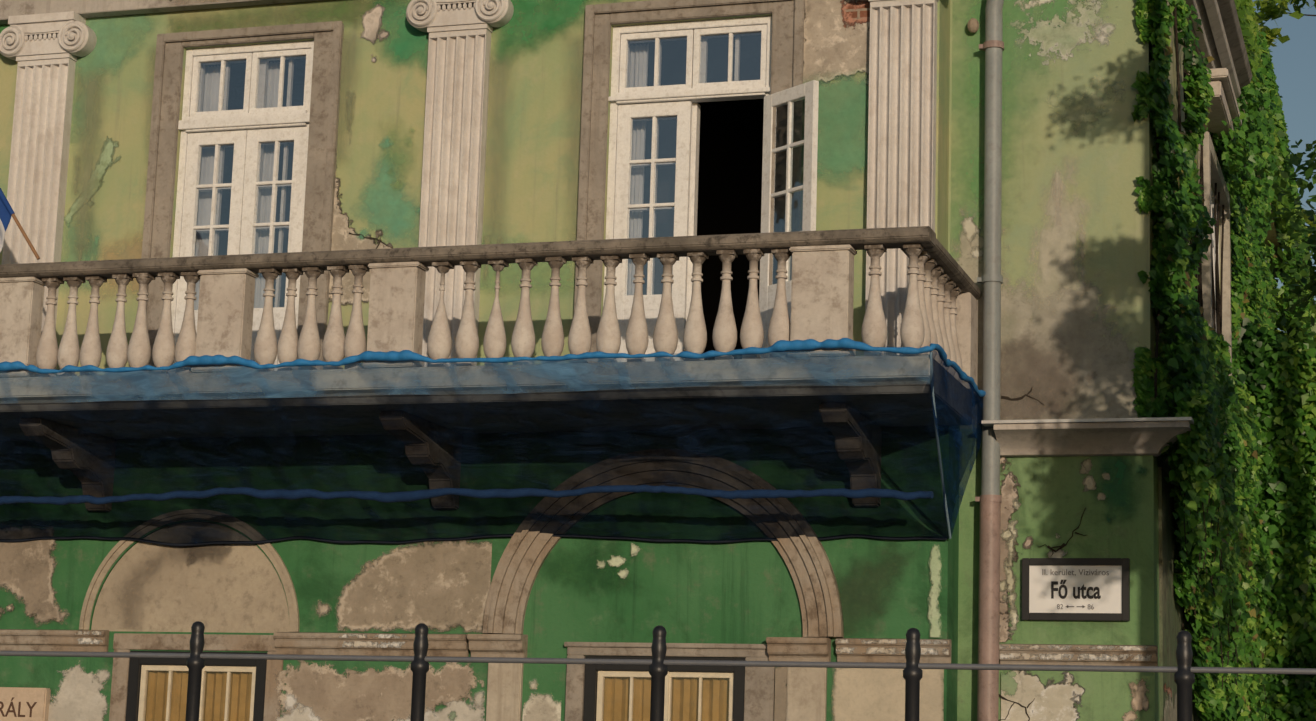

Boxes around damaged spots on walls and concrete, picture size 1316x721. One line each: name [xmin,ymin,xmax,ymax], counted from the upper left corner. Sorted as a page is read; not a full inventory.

flaking render [803,0,870,85]
peeling [1010,0,1115,65]
crack [349,232,392,249]
damp [1032,172,1086,312]
crack [1040,508,1086,556]
flaking render [0,528,69,624]
flaking render [317,540,492,648]
flaking render [999,458,1152,721]
flaking render [48,664,110,721]
flaking render [275,660,485,721]
flaking render [833,639,949,721]
crack [999,694,1035,721]